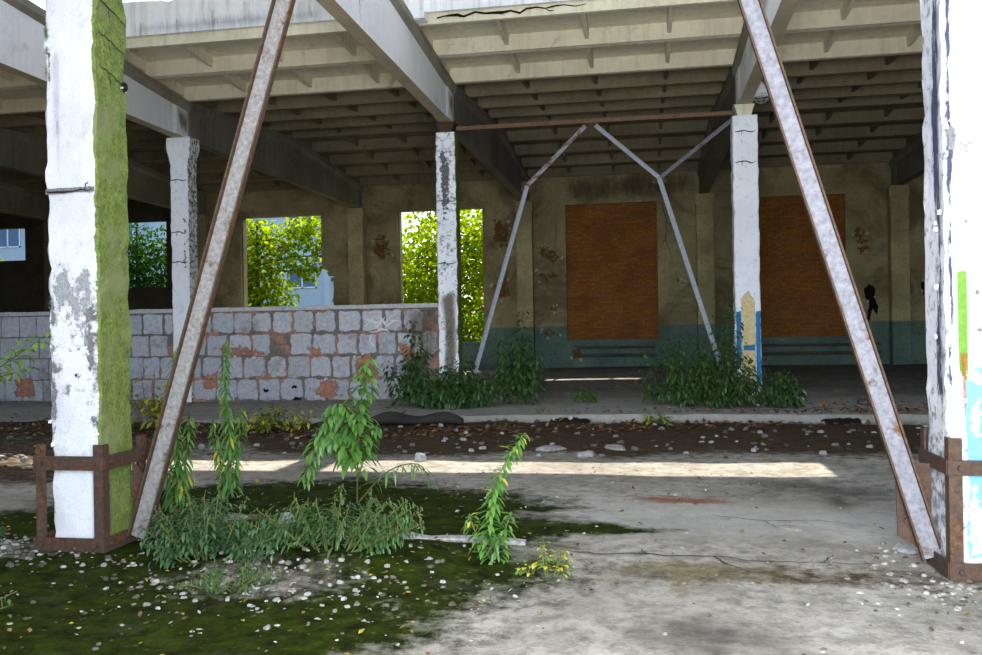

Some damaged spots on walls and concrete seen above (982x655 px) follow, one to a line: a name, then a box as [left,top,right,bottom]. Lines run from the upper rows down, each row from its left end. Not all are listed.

crack [437,4,585,19]
peeling [439,147,451,229]
peeling [49,263,101,378]
peeling [442,294,456,375]
peeling [48,339,58,447]
spalling [315,377,342,401]
peeling [965,476,982,563]